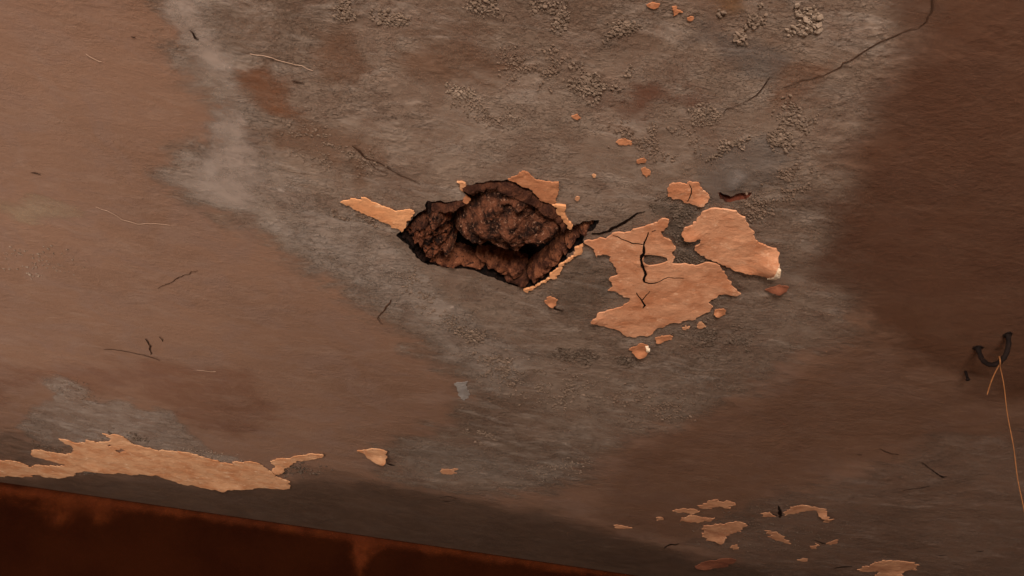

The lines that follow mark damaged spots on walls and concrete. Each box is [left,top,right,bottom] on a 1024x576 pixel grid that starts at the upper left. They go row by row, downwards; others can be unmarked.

peeling [646,2,694,21]
crack [724,0,934,112]
spalling [331,170,789,367]
damp [158,0,1024,496]
crack [592,212,643,234]
damp [19,377,237,462]
peeling [0,428,333,492]
peeling [357,448,387,466]
corrosion [0,487,460,568]
peeling [656,499,748,570]
peeling [761,505,834,523]
peeling [857,560,919,576]